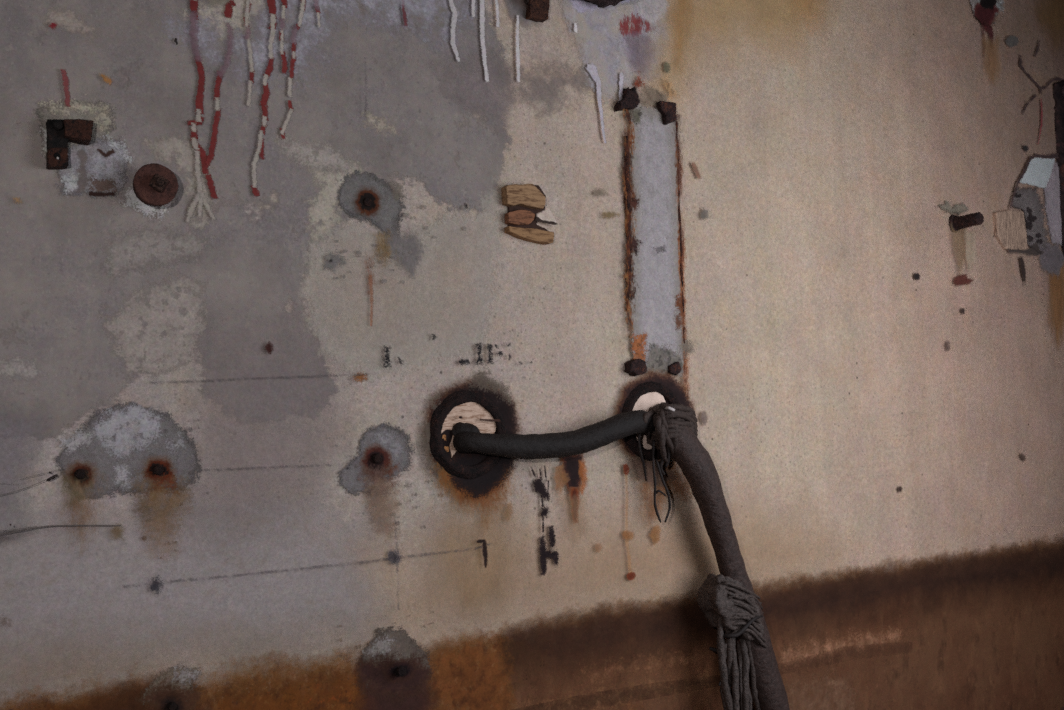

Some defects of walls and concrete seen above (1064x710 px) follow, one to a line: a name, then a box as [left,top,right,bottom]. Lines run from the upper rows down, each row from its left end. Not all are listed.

rust [974,3,999,80]
rust [354,188,381,217]
rust [602,110,695,414]
rust [63,462,95,504]
rust [139,458,187,537]
rust [361,446,397,497]
rust [418,367,520,529]
rust [621,434,692,544]
damp [184,597,736,710]
damp [753,542,1064,710]
damp [0,680,161,710]